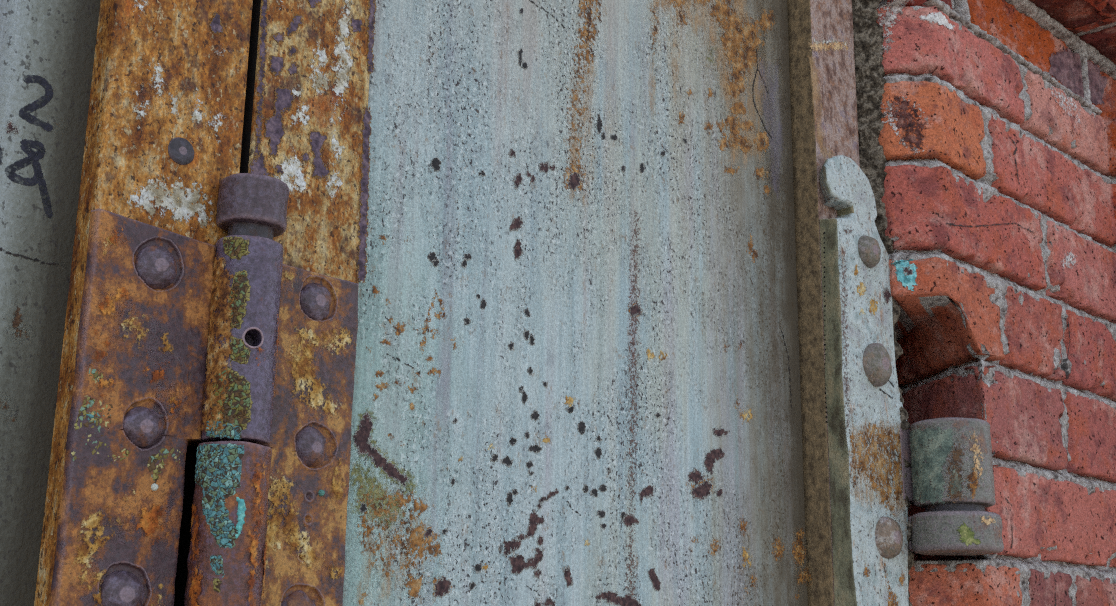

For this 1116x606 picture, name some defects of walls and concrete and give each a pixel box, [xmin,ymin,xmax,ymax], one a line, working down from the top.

rust [566,0,602,171]
rust [650,0,775,175]
rust [98,287,149,341]
rust [144,333,174,383]
rust [201,256,236,435]
rust [256,285,457,414]
rust [839,248,904,515]
rust [73,506,122,606]
rust [136,502,169,545]
rust [189,505,203,606]
rust [246,463,342,606]
rust [332,459,442,598]